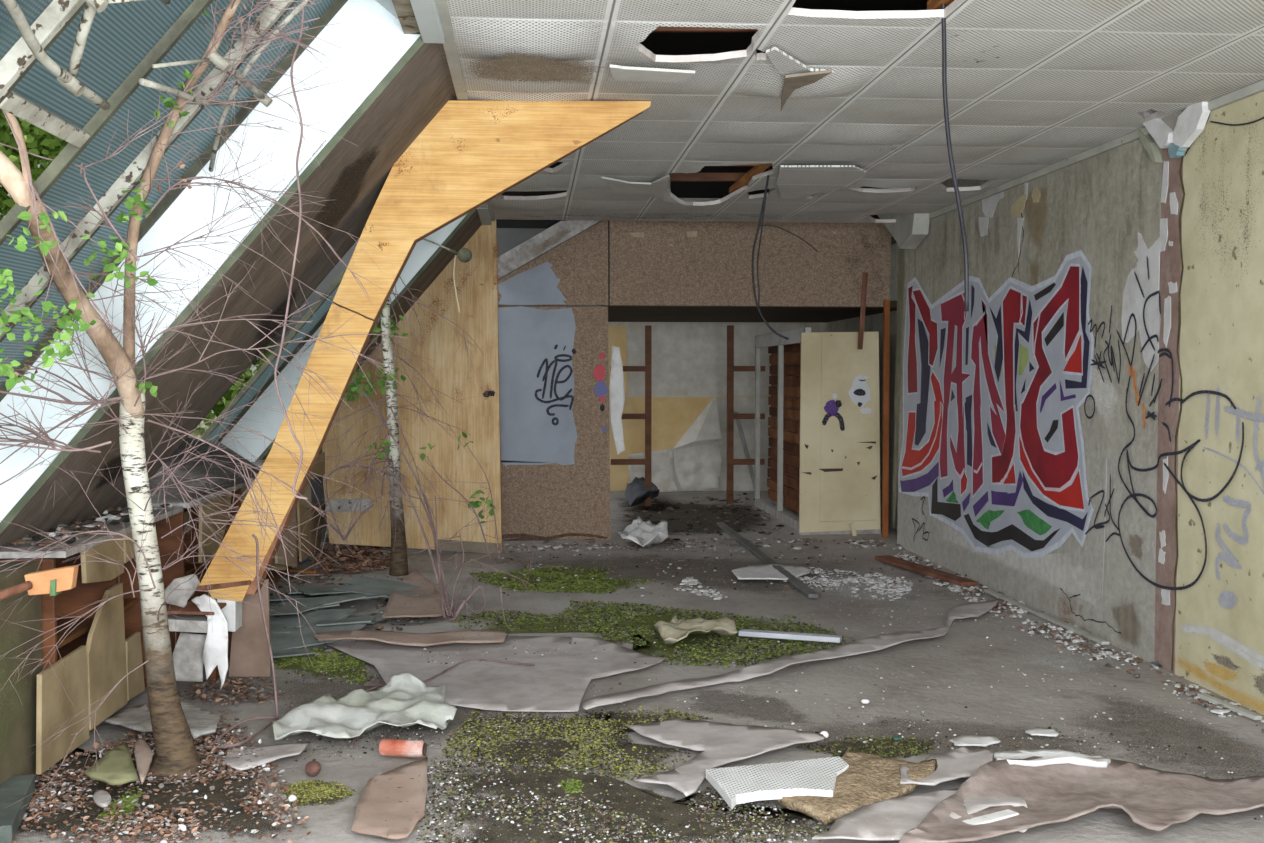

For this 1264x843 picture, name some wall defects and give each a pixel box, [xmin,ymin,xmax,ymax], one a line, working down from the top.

leakage [458,51,604,86]
peeling [1121,102,1211,371]
peeling [1158,530,1166,564]
peeling [1161,589,1170,606]